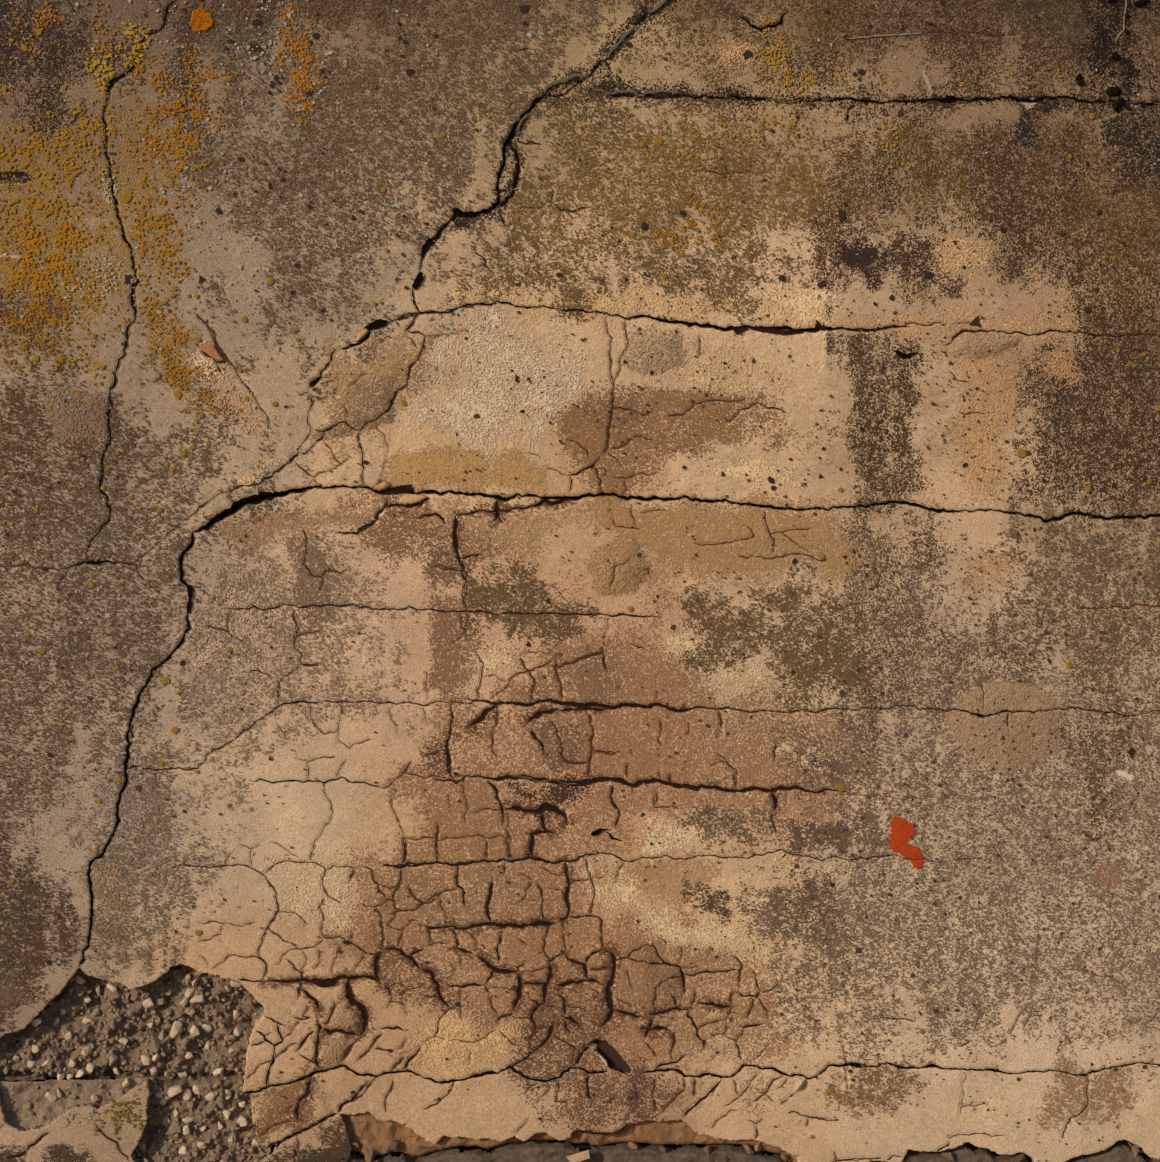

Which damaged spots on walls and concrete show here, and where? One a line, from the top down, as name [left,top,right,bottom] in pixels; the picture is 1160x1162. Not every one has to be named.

crack [846,30,1002,42]
crack [612,92,1160,124]
crack [0,0,944,590]
crack [945,318,1152,345]
spalling [0,964,271,1162]
spalling [342,1111,797,1162]